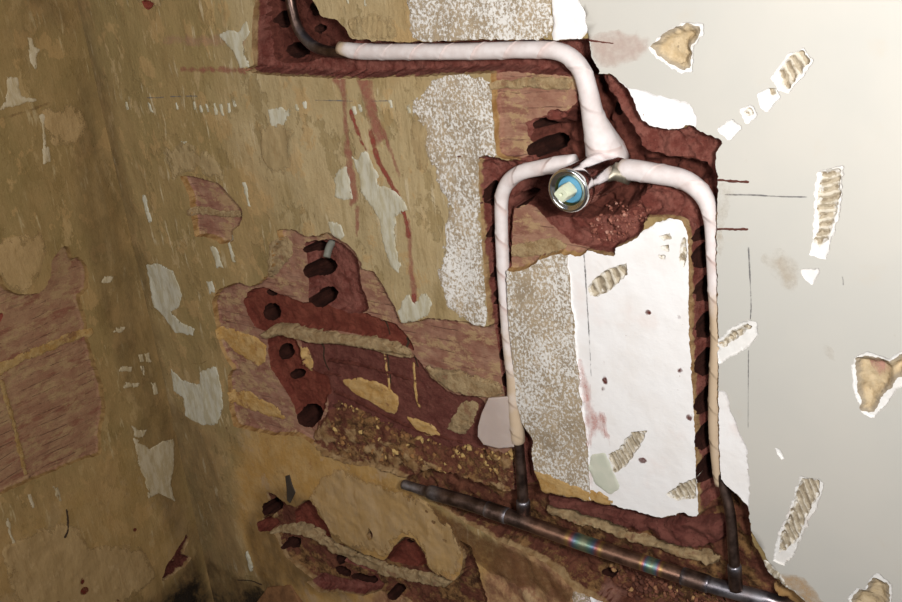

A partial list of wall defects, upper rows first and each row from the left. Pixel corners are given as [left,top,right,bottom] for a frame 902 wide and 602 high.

spalling [488,71,586,160]
spalling [587,50,714,183]
spalling [649,22,704,74]
spalling [718,47,814,140]
peeling [334,151,408,273]
spalling [507,174,653,272]
spalling [801,165,845,285]
spalling [588,263,628,297]
spalling [171,222,515,602]
spalling [851,351,902,418]
peeling [588,430,647,494]
spalling [764,476,824,587]